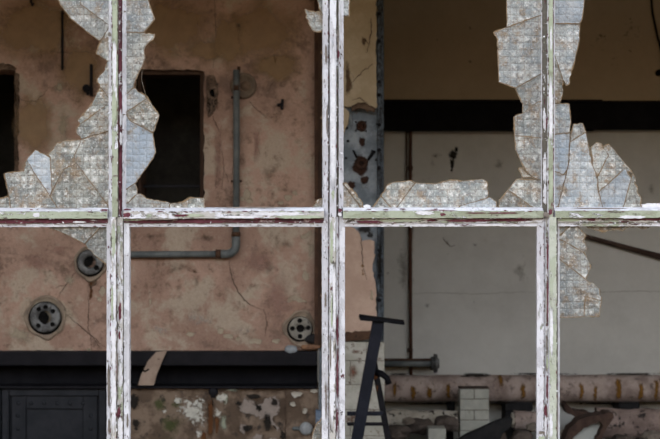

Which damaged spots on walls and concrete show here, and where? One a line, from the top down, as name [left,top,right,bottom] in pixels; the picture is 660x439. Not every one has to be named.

peeling [351,0,559,228]
crack [67,292,105,350]
peeling [123,189,345,432]
crack [229,265,267,335]
peeling [239,396,280,439]